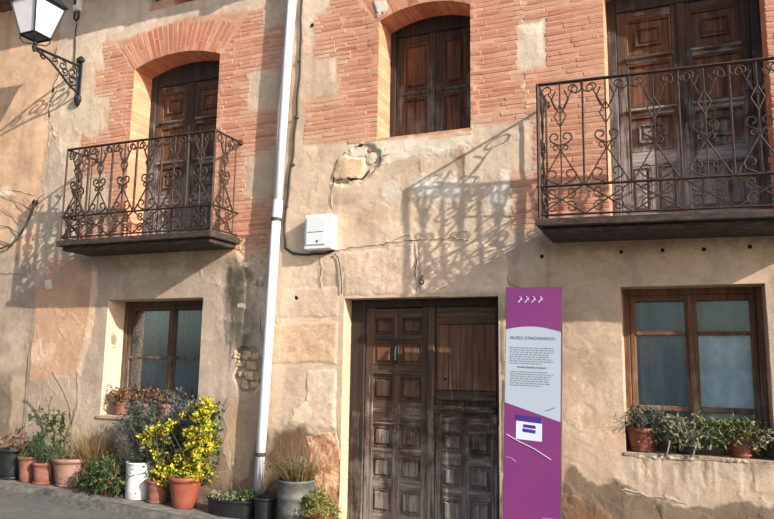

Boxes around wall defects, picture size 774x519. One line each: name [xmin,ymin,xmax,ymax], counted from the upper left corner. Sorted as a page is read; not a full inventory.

peeling [329,129,474,209]
crack [317,230,472,292]
damp [91,250,263,378]
damp [562,456,774,519]